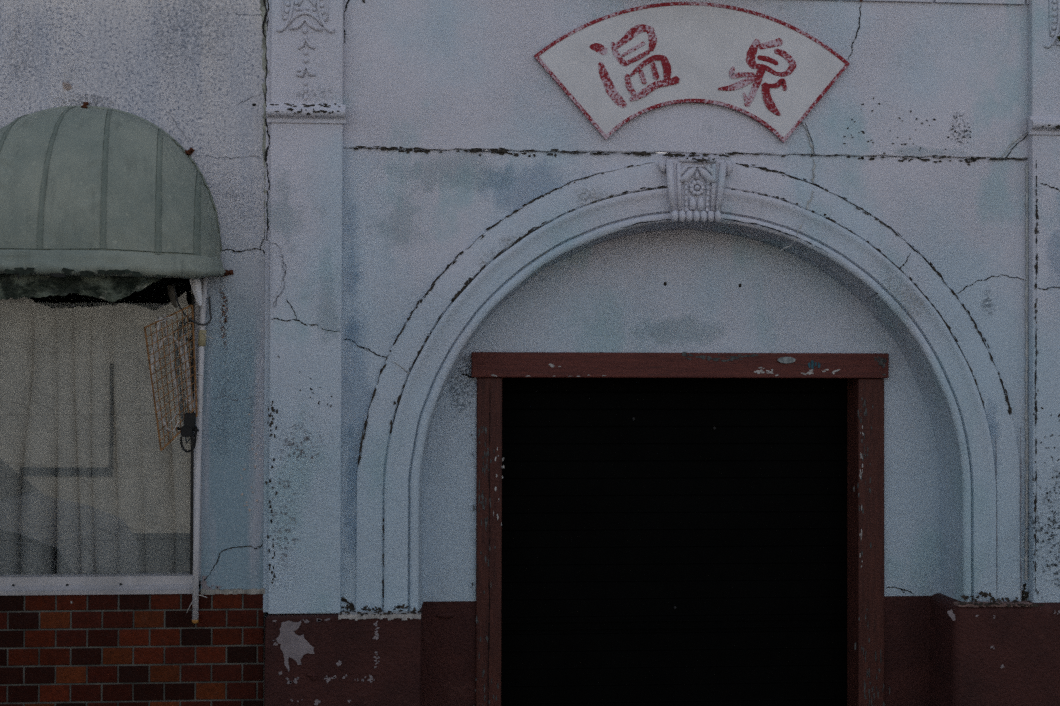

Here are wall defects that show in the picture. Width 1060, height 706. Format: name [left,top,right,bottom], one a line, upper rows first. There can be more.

crack [726,122,828,253]
crack [222,237,410,374]
crack [957,130,1060,598]
crack [205,541,263,580]
damp [1025,434,1060,586]
peeling [273,618,330,684]
peeling [324,621,380,683]